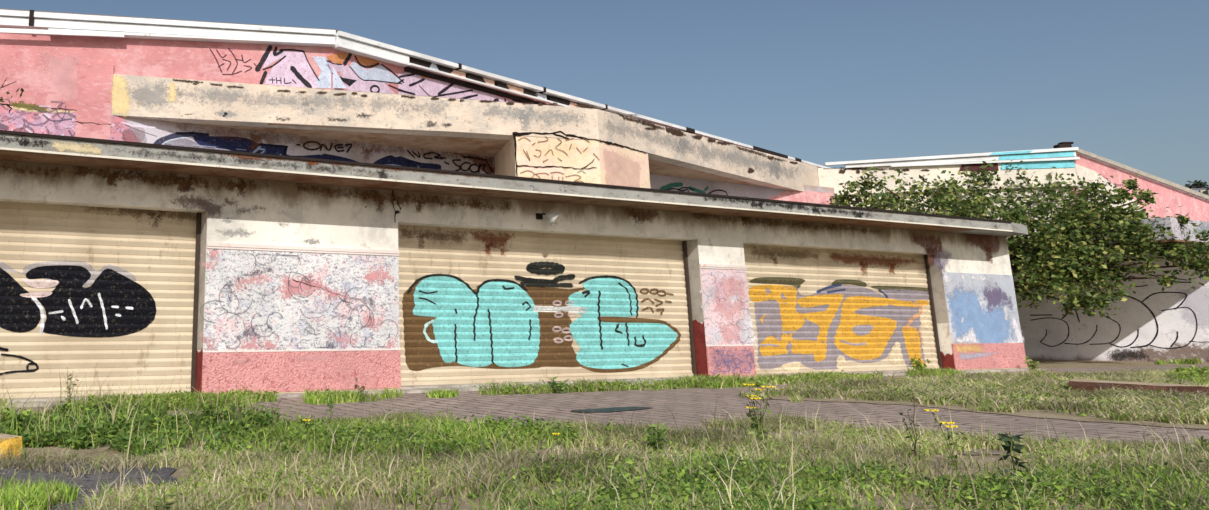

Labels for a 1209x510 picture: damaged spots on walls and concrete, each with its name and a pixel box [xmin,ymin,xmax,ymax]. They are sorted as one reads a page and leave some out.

damp [0,136,49,147]
damp [75,166,261,195]
damp [138,149,509,211]
corrosion [401,226,514,255]
corrosion [830,233,942,275]
peeling [222,269,348,302]
peeling [361,266,394,351]
peeling [942,270,1024,359]
peeling [200,322,280,353]